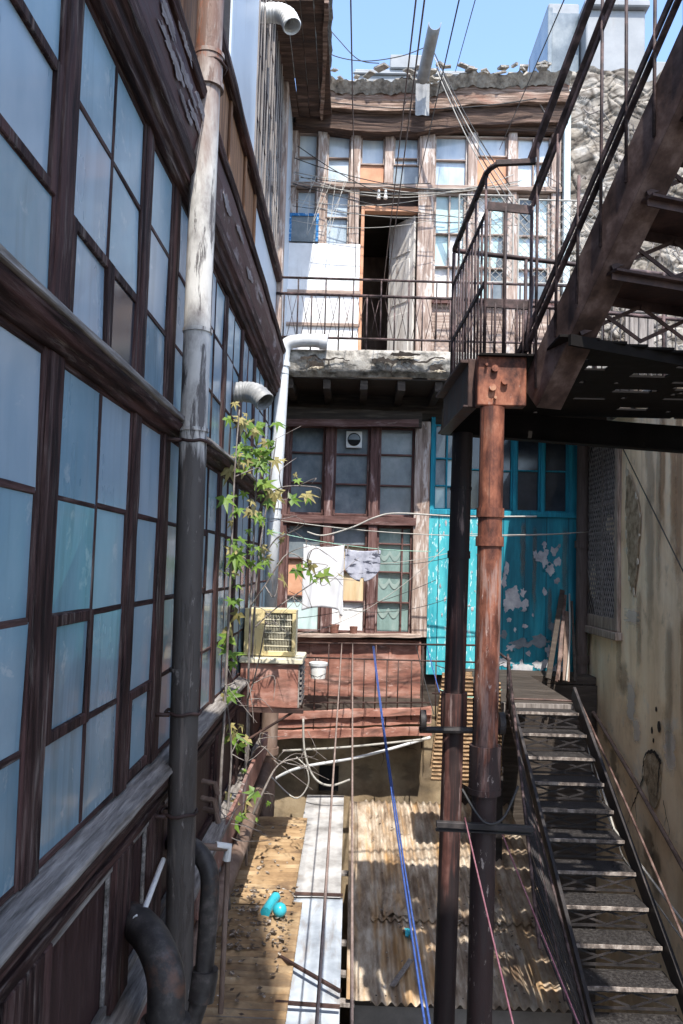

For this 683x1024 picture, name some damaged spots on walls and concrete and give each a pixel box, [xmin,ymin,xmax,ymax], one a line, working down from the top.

peeling [157,0,205,135]
peeling [499,562,563,672]
peeling [533,541,561,596]
flaking render [642,707,662,809]